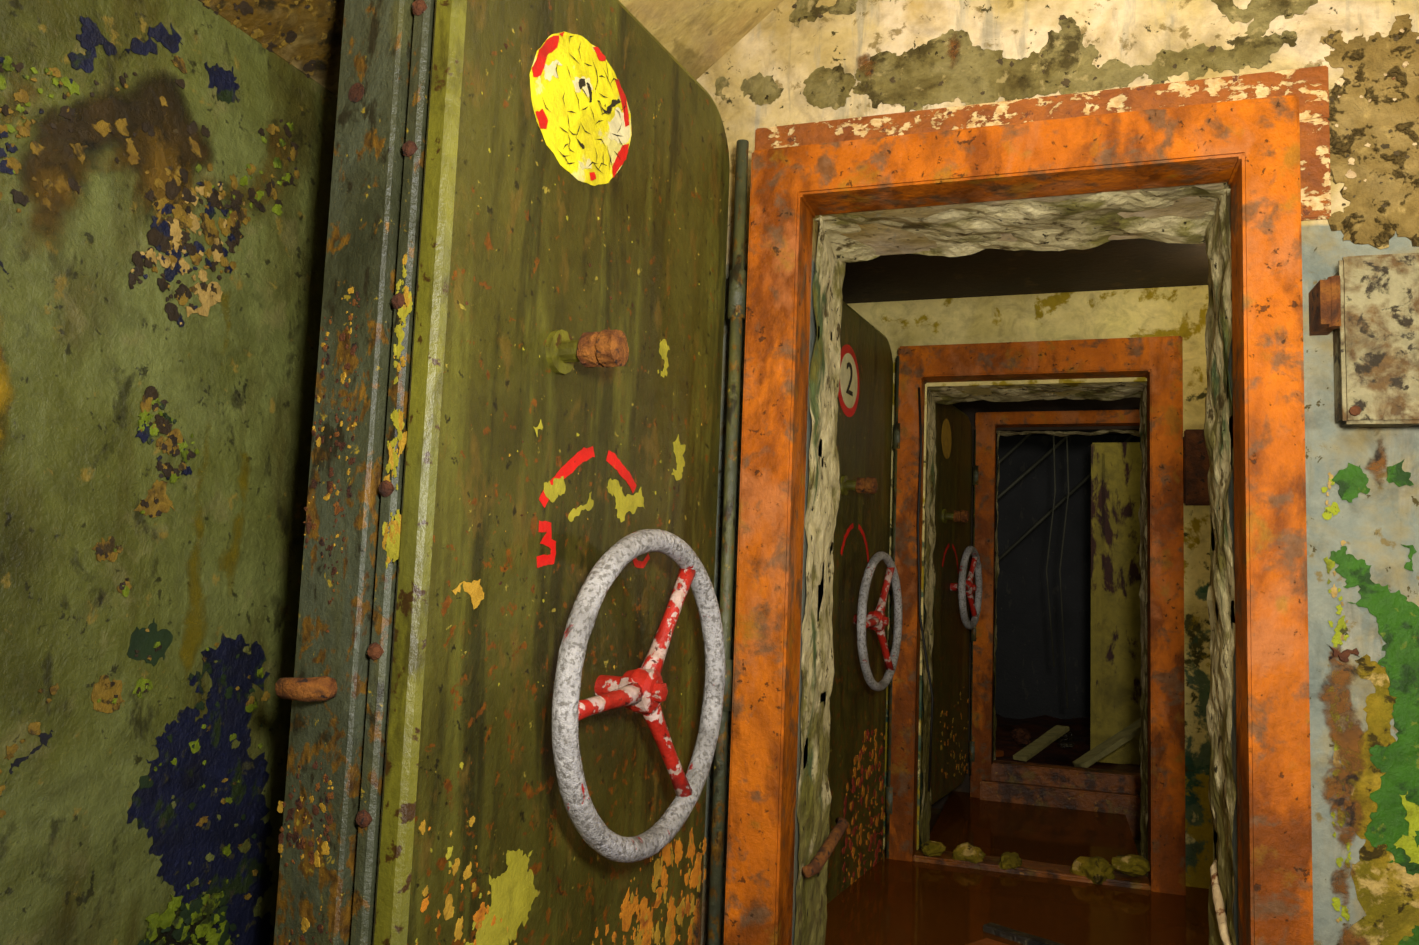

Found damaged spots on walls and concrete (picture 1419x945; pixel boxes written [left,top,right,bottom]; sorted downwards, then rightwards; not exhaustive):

peeling [67,16,183,73]
damp [0,55,300,236]
peeling [715,72,784,106]
flaking render [803,0,1318,112]
spalling [1320,14,1419,250]
peeling [128,178,248,327]
corrosion [303,287,360,604]
peeling [1321,463,1370,520]
peeling [127,633,273,945]
peeling [1323,540,1419,945]
peeling [419,820,538,945]
peeling [592,827,707,945]